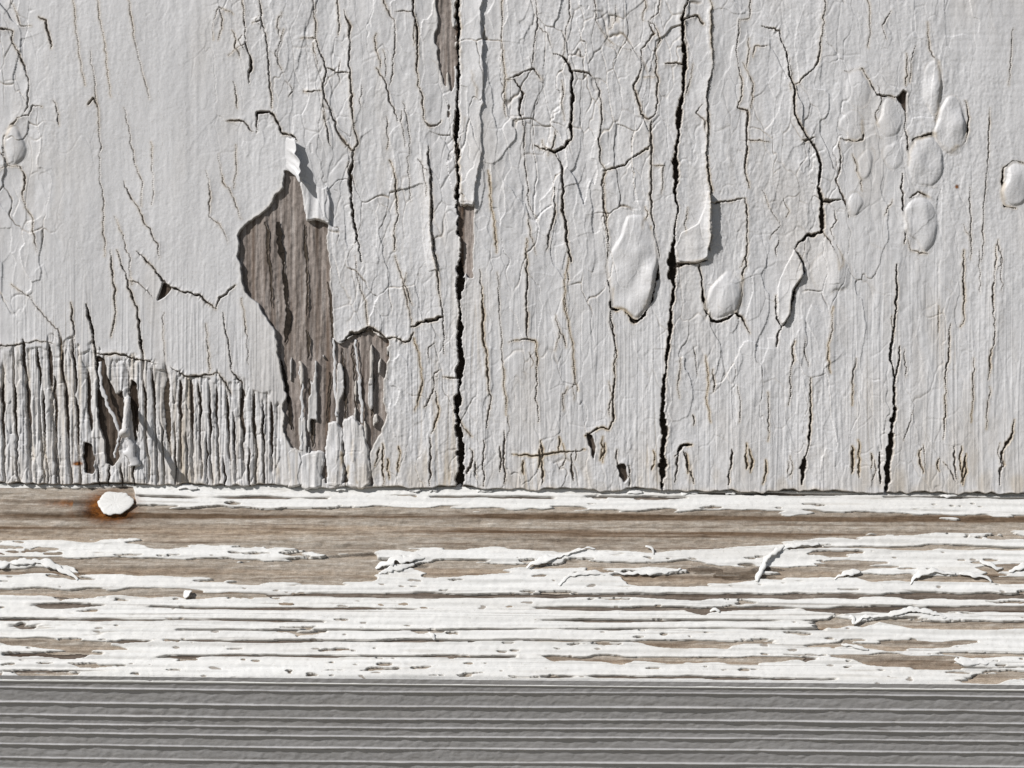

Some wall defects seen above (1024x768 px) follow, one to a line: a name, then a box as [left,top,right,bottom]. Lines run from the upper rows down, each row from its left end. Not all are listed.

rust [88,495,131,521]
crack [1,179,246,397]
crack [235,5,295,138]
crack [335,90,358,241]
peeling [435,0,484,278]
peeling [0,137,1024,684]
crack [345,0,749,488]
crack [799,389,811,484]
crack [775,30,864,359]
crack [851,270,899,491]
crack [945,111,1011,381]
crack [999,426,1013,475]